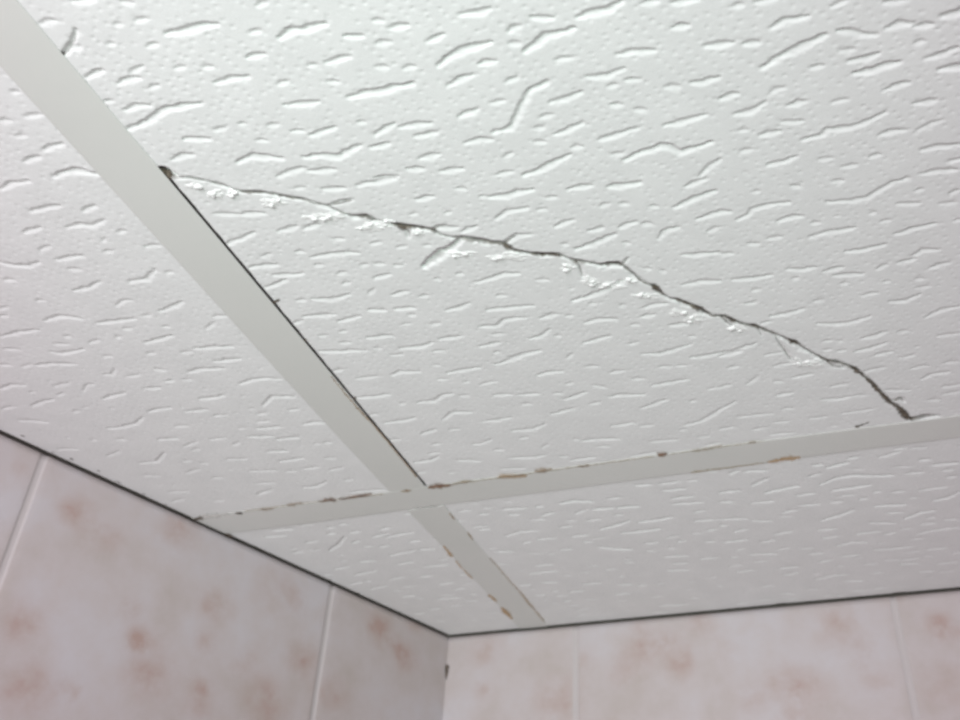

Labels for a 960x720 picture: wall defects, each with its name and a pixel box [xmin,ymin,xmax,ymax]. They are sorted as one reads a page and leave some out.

crack [159,167,173,178]
crack [242,191,303,199]
crack [359,214,436,232]
crack [472,238,916,420]
rust [691,457,800,473]